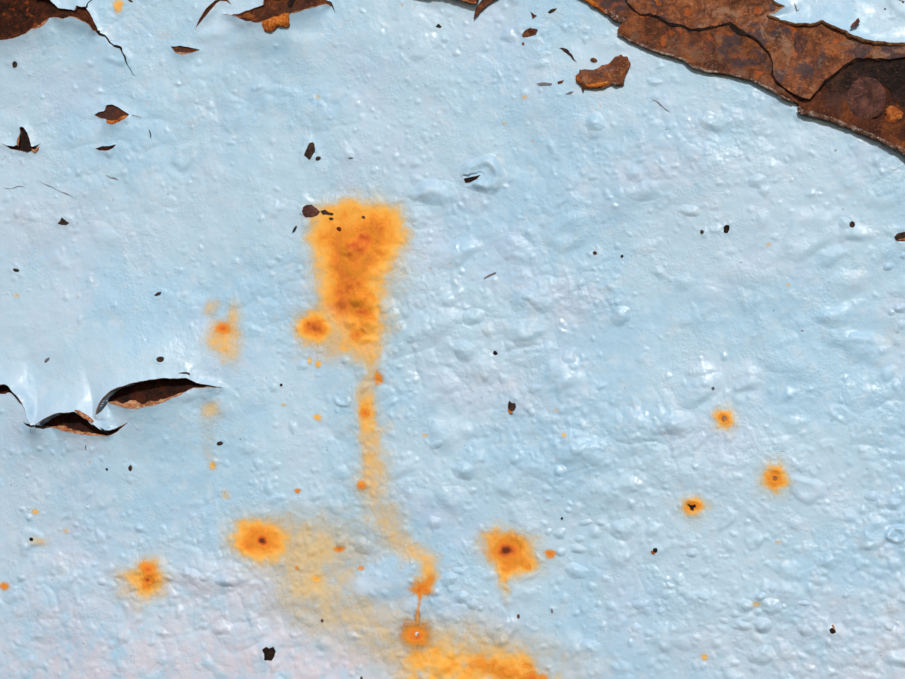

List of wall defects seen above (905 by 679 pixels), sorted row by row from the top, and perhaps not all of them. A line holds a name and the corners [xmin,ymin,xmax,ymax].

peeling [0,0,104,46]
corrosion [208,311,239,357]
corrosion [295,198,555,679]
corrosion [713,410,734,429]
corrosion [762,464,789,494]
corrosion [682,497,705,516]
corrosion [228,517,291,565]
corrosion [121,558,166,599]